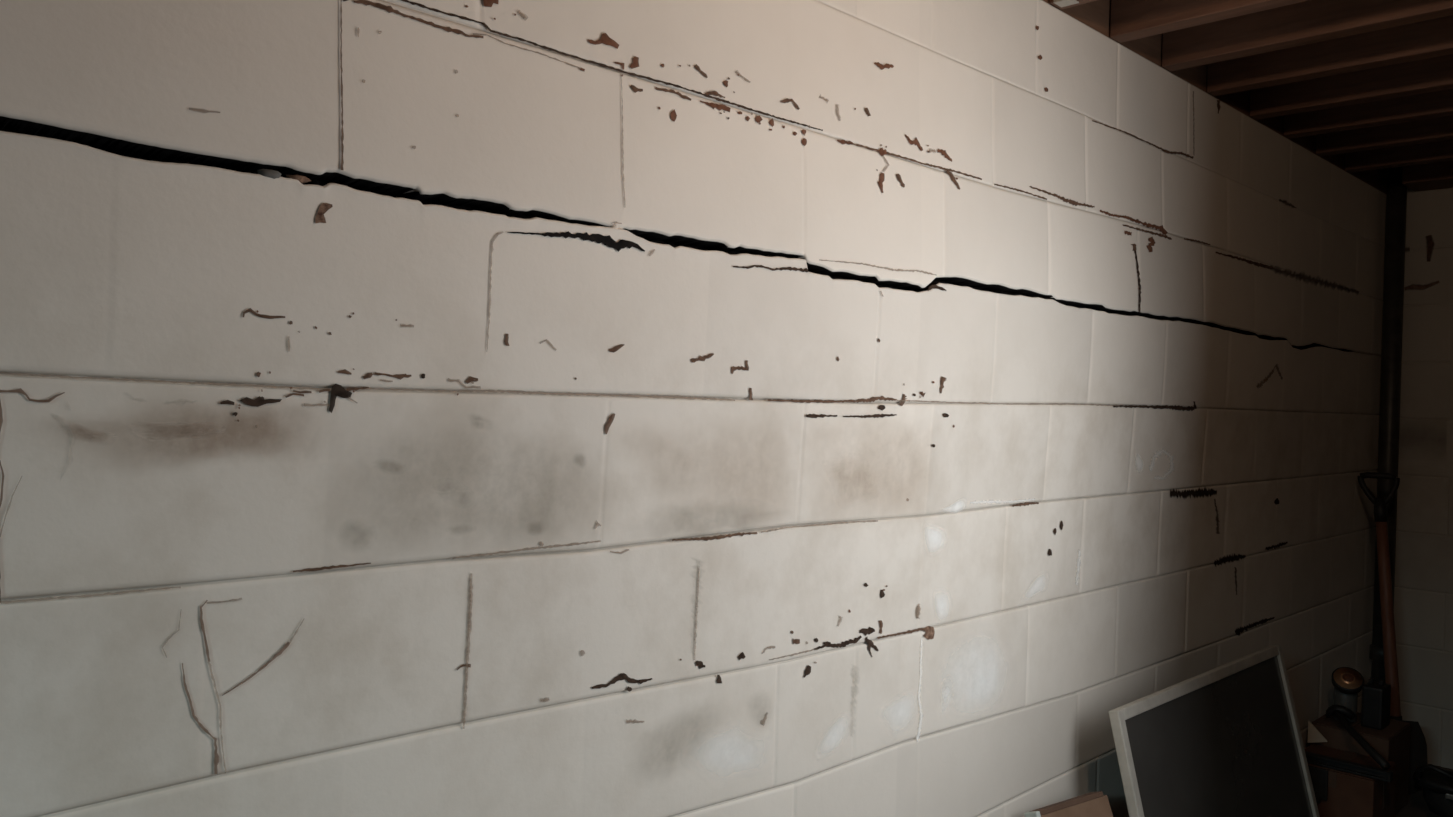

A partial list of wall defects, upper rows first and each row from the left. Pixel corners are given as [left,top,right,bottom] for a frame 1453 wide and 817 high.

crack [0,0,1359,352]
crack [0,372,1197,536]
crack [672,520,876,541]
crack [452,541,629,559]
crack [293,563,371,572]
crack [769,627,923,660]
crack [0,574,304,774]